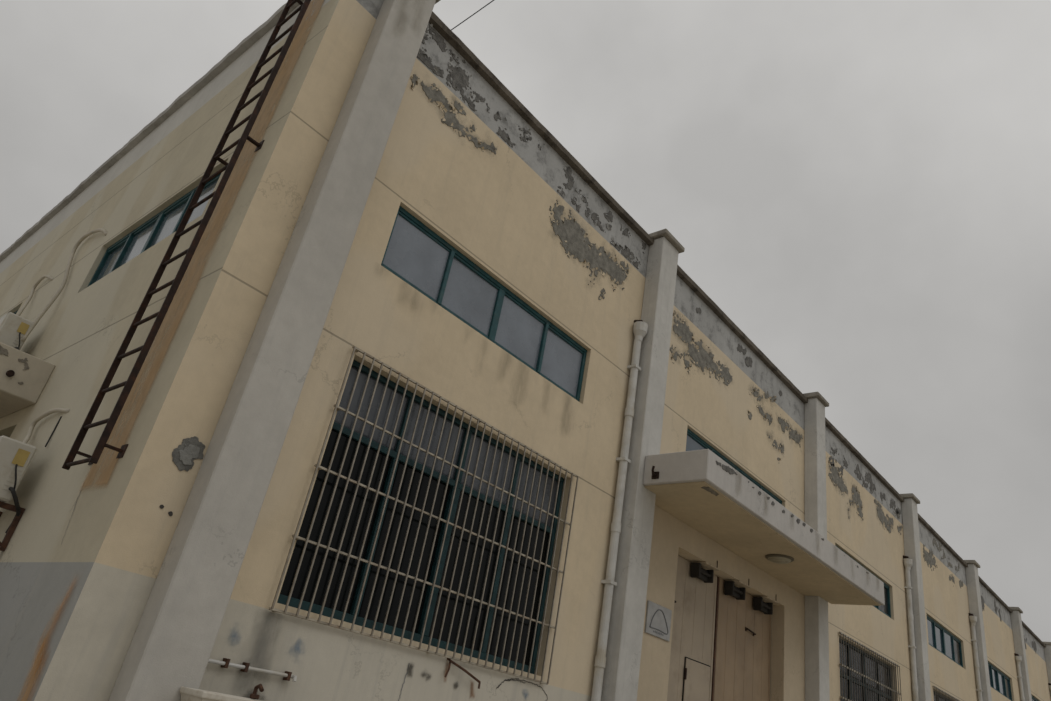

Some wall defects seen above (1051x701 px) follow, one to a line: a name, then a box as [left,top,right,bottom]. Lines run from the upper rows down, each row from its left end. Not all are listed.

peeling [409,24,545,154]
peeling [549,166,647,301]
spalling [0,345,29,385]
peeling [670,310,732,388]
peeling [172,436,205,472]
peeling [828,447,902,535]